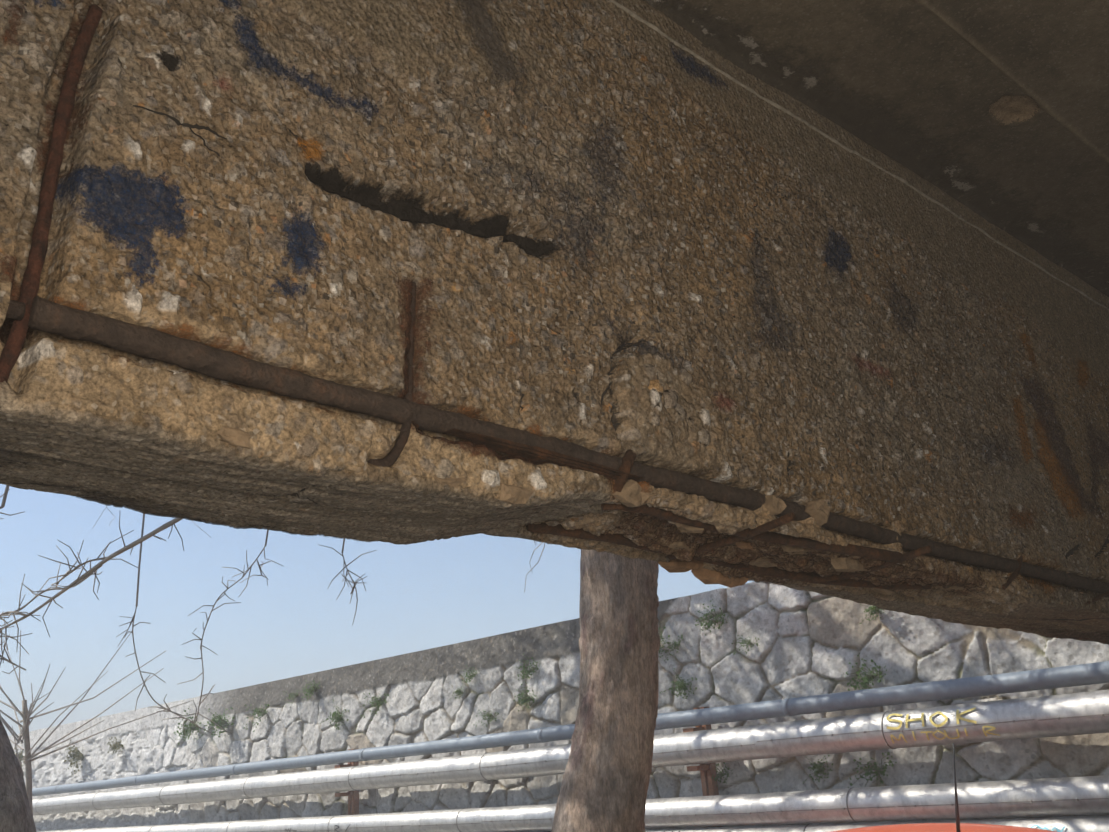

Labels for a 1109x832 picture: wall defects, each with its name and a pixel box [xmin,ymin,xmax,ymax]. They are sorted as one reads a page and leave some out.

crack [133,105,226,156]
corrosion [0,318,14,344]
corrosion [1,255,21,301]
corrosion [396,275,437,405]
spalling [0,4,1109,615]
crack [601,343,633,457]
corrosion [411,421,545,466]
corrosion [604,511,986,596]